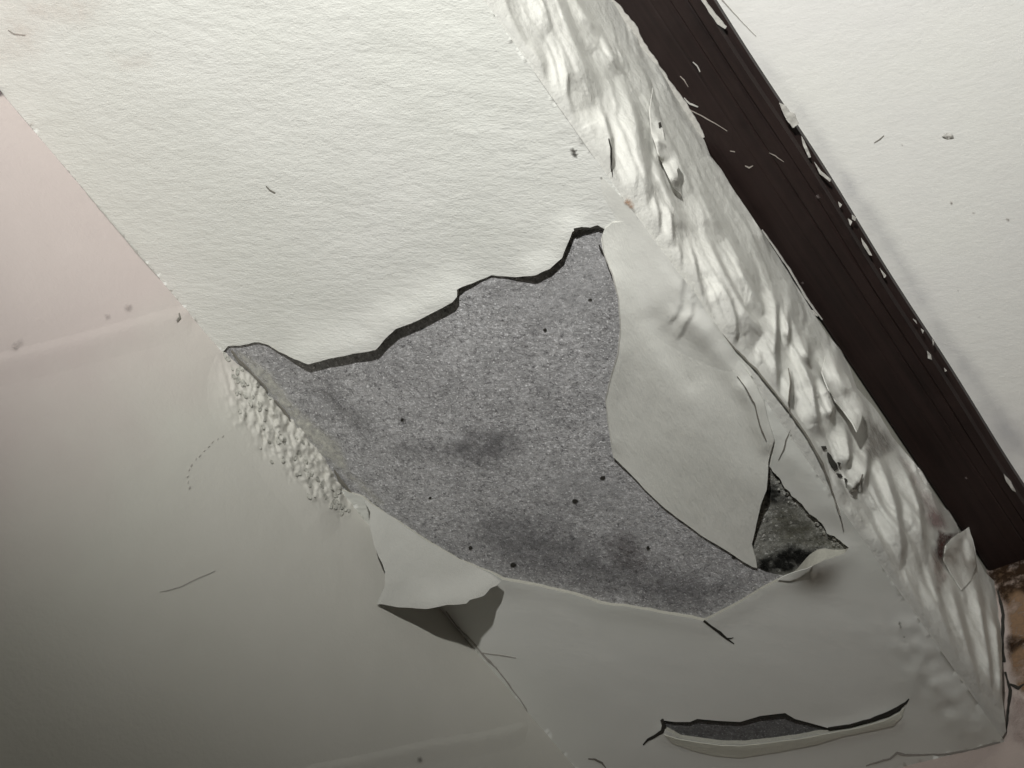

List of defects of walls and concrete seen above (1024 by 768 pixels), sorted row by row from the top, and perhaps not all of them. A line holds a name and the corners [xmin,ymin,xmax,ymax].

spalling [207,222,849,621]
peeling [821,352,863,432]
crack [446,611,528,712]
crack [703,620,734,644]
spalling [660,708,902,744]